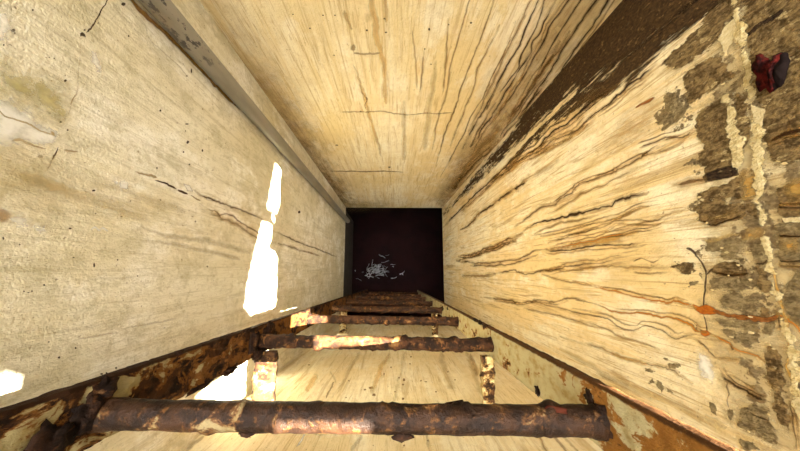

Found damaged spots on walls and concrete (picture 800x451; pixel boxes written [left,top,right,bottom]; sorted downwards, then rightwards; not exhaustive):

crack [80,0,108,37]
leakage [435,0,726,221]
crack [120,172,212,201]
spalling [654,0,800,451]
rust [578,274,800,361]
crack [686,247,713,330]
peeling [645,368,673,393]